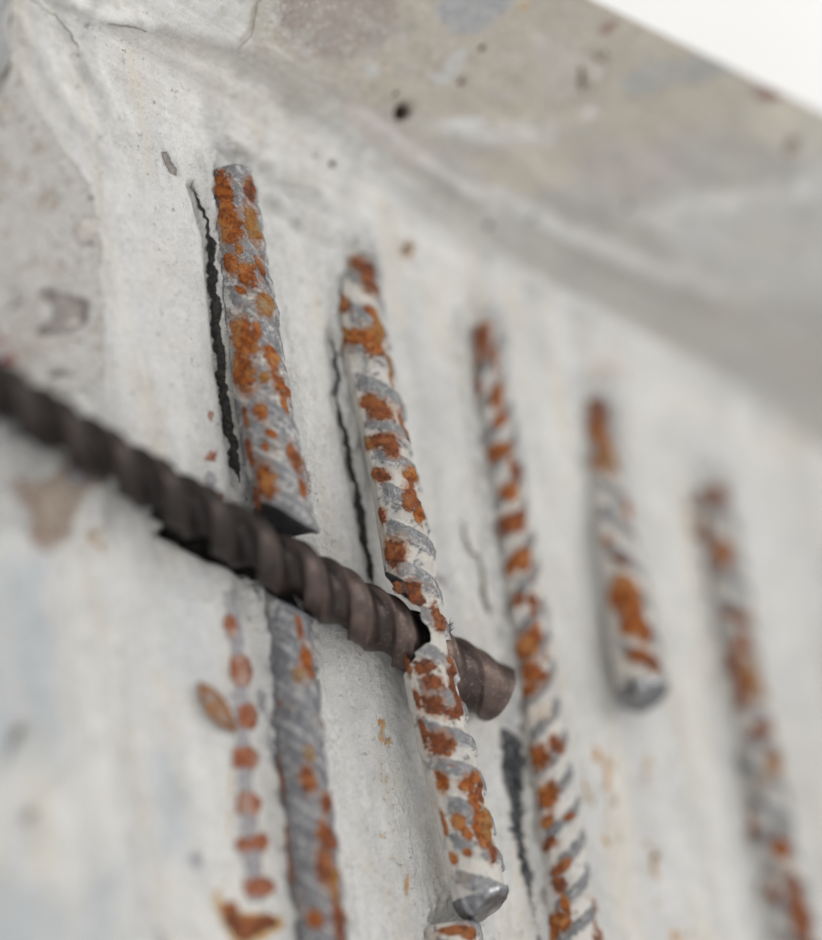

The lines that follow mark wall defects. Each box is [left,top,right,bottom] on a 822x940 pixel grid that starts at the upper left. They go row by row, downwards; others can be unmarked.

crack [0,0,79,90]
spalling [0,64,106,396]
crack [108,23,148,32]
spalling [162,152,177,176]
spalling [213,164,320,536]
rust [198,590,284,940]
spalling [148,508,350,940]
rust [378,719,393,746]
spalling [339,252,509,940]
spalling [471,321,603,940]
spalling [586,395,669,714]
spalling [696,483,817,940]